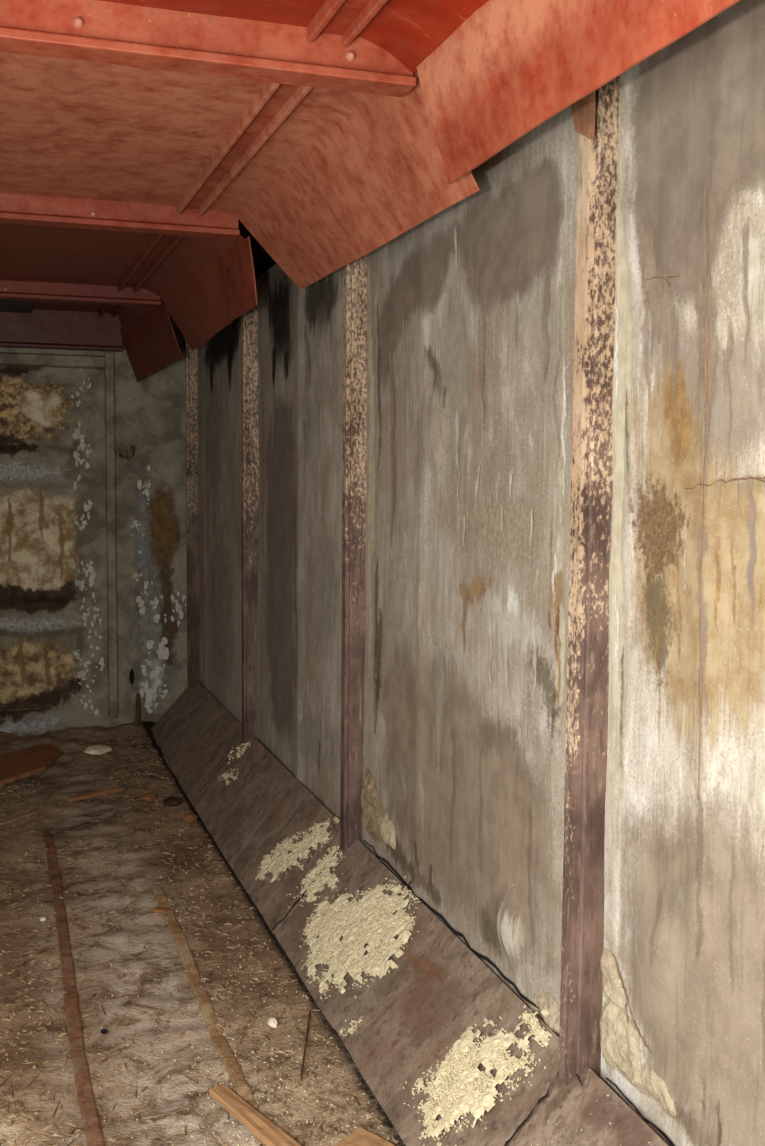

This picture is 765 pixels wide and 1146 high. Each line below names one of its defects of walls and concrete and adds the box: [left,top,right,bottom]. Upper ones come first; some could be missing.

water stain [133,470,170,709]
corrosion [150,490,180,665]
water stain [367,161,567,956]
water stain [608,0,765,1146]
corrosion [628,354,765,744]
crack [645,188,765,799]